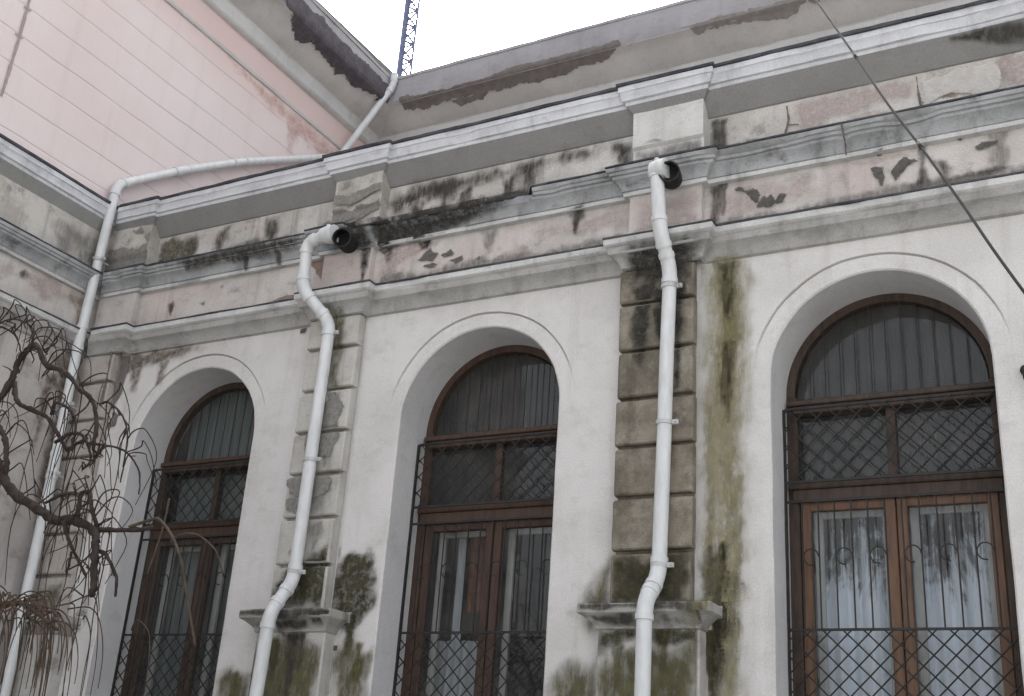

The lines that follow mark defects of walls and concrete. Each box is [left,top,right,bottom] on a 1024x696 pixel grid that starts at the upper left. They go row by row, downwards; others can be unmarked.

peeling [286,0,620,110]
damp [159,220,295,271]
spalling [378,243,480,282]
damp [341,160,541,282]
damp [573,205,583,232]
spalling [735,187,786,207]
spalling [871,148,918,186]
spalling [975,140,998,150]
damp [629,243,662,361]
damp [652,238,743,696]
damp [580,557,650,665]
damp [345,613,362,680]